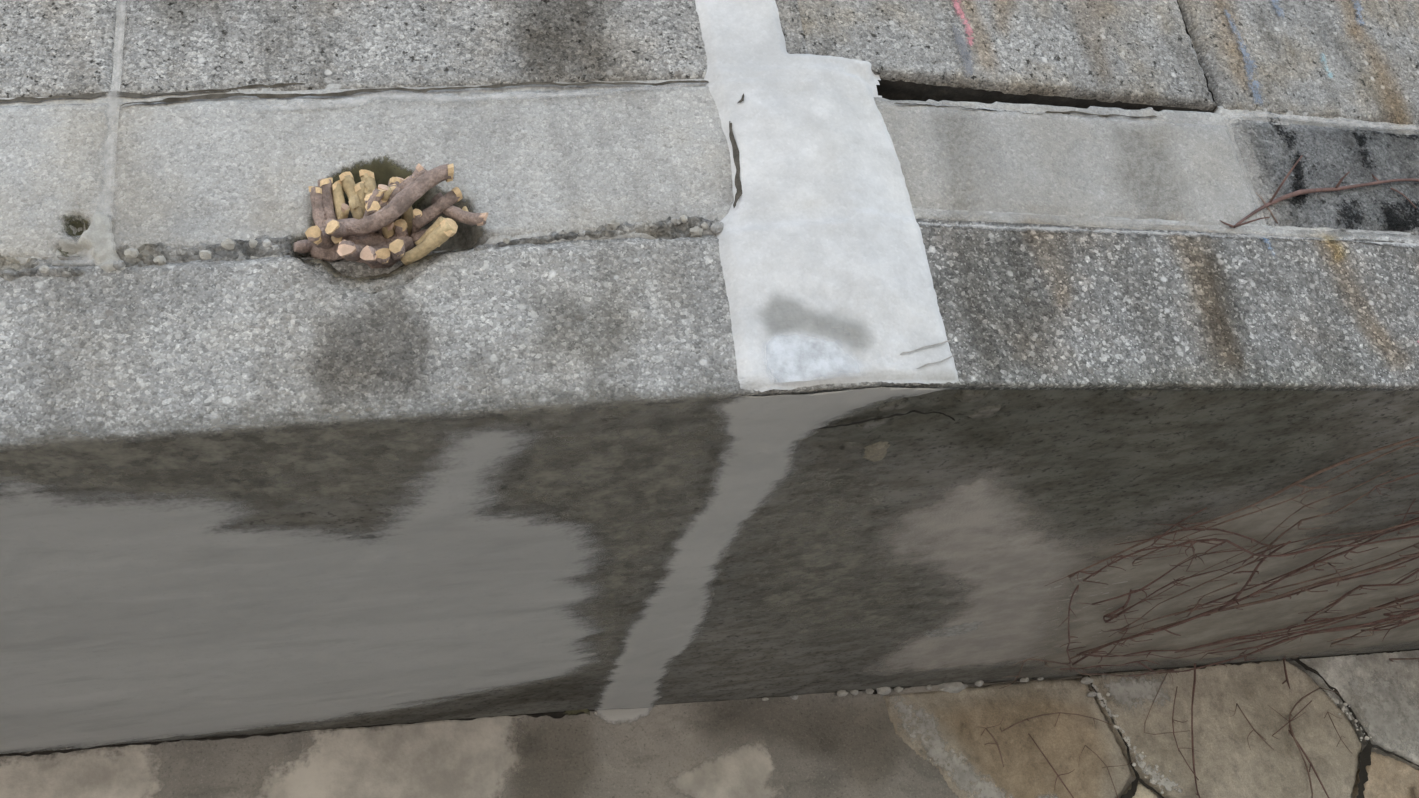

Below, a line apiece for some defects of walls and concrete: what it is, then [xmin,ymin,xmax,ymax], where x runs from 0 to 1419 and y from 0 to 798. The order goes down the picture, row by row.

crack [0,80,709,106]
spalling [327,156,414,218]
spalling [113,186,724,283]
crack [729,94,744,208]
mould [1267,111,1308,208]
damp [1336,198,1419,246]
damp [0,387,724,661]
damp [752,469,929,635]